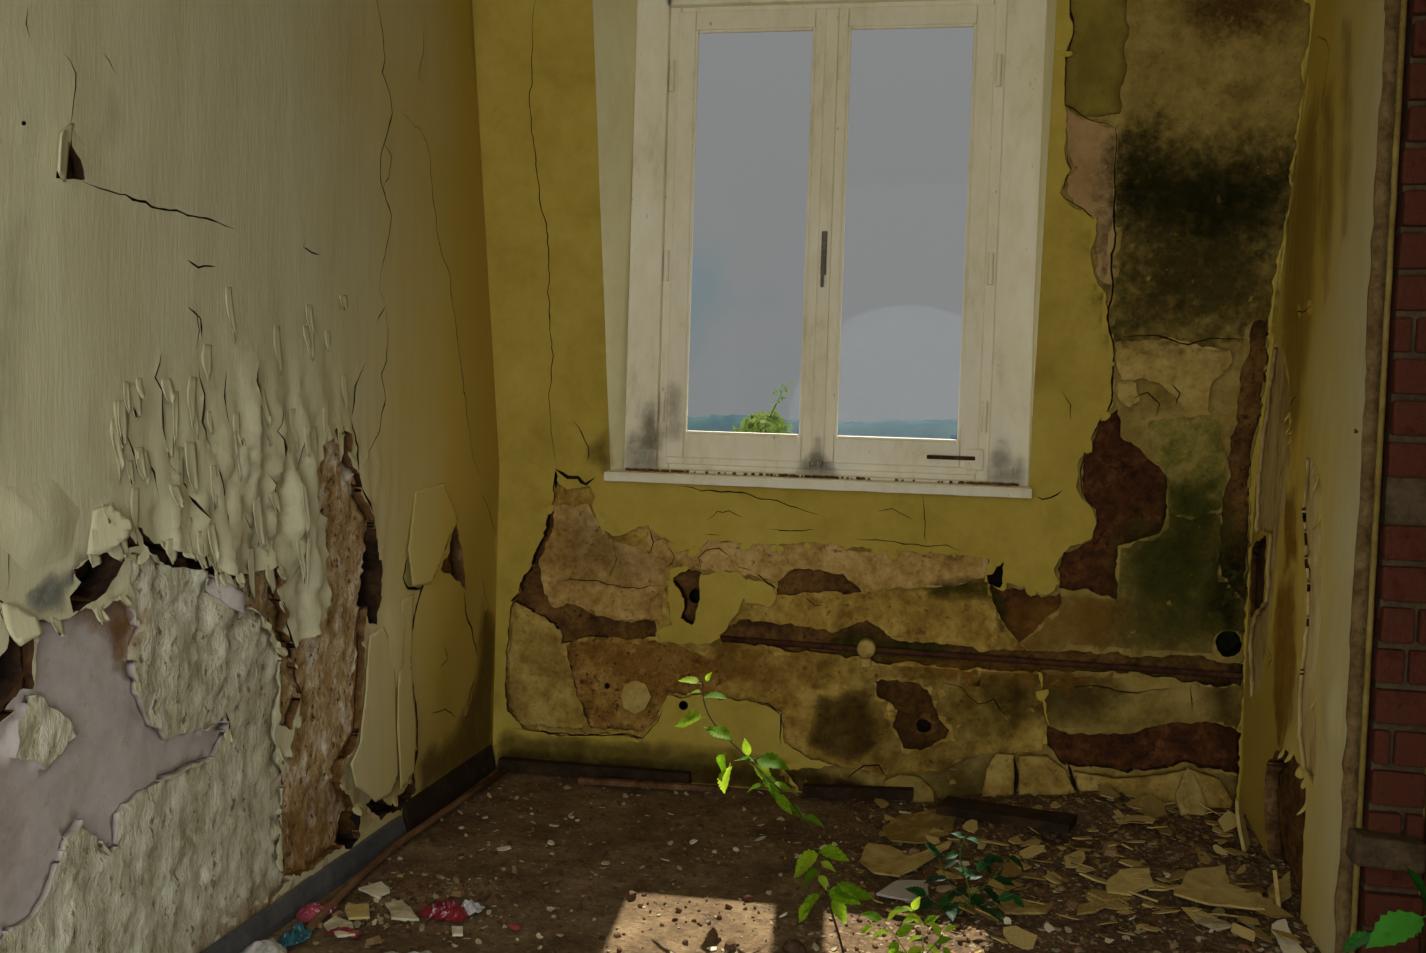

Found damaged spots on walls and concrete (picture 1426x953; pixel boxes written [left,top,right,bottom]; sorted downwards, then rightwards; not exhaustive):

peeling [56,123,85,182]
crack [529,3,594,488]
mould [1111,133,1295,341]
flaking render [505,0,1322,953]
leakage [1284,501,1296,566]
peeling [0,344,418,953]
leakage [1274,587,1295,743]